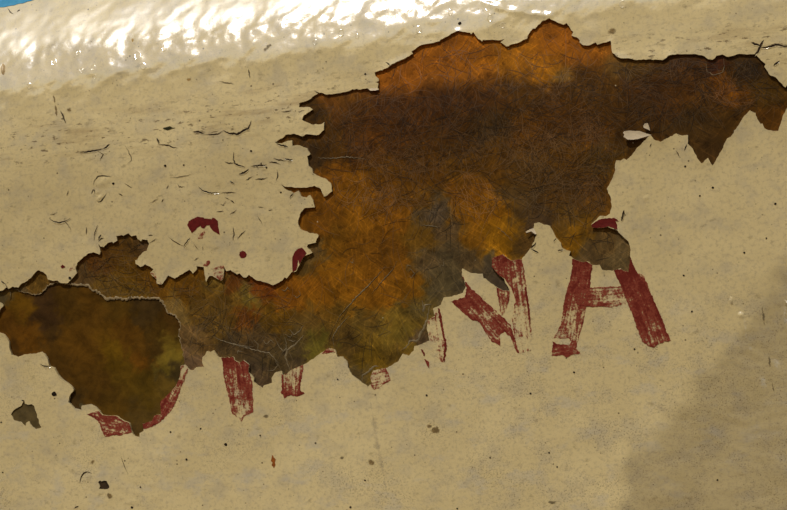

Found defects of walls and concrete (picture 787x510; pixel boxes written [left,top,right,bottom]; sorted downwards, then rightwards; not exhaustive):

peeling [187,217,220,239]
peeling [592,218,618,229]
peeling [292,248,306,271]
peeling [10,270,60,295]
peeling [12,400,41,429]